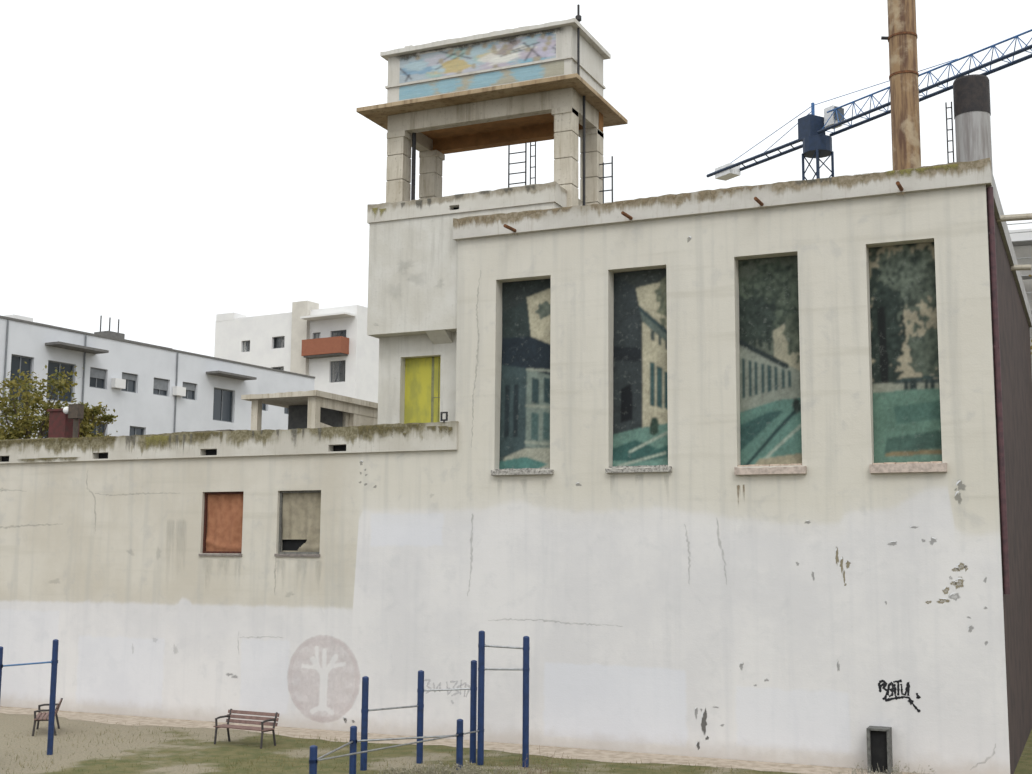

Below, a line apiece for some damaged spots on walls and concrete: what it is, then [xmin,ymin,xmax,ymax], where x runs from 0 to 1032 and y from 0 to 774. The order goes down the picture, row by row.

leakage [899,164,958,175]
leakage [21,435,135,462]
leakage [152,432,222,448]
leakage [365,425,406,435]
peeling [835,547,850,586]
peeling [926,563,968,604]
peeling [694,706,718,750]